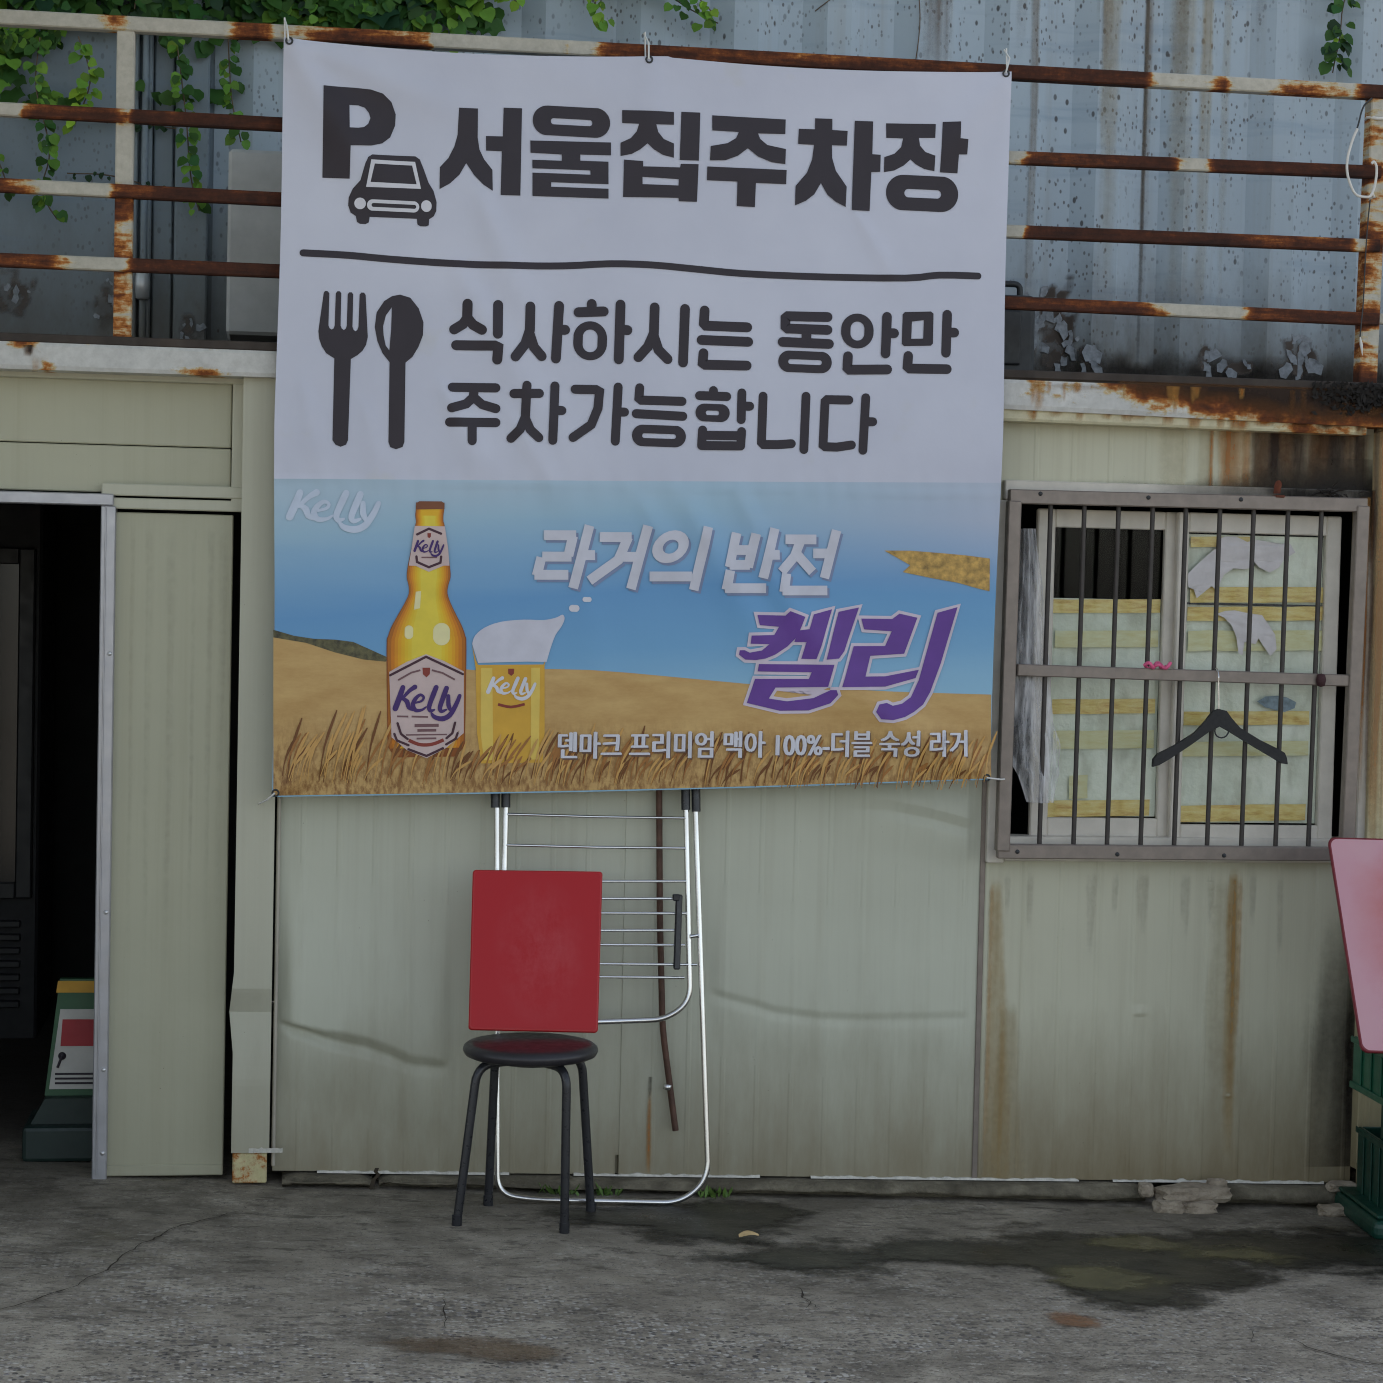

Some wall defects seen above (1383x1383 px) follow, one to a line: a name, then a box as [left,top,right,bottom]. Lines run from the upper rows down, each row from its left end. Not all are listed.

peeling [1023,277,1103,373]
peeling [1198,345,1253,378]
peeling [1279,333,1323,380]
rust [1135,384,1383,789]
rust [1228,879,1237,1071]
crack [2,1212,231,1309]
water stain [544,1200,1383,1311]